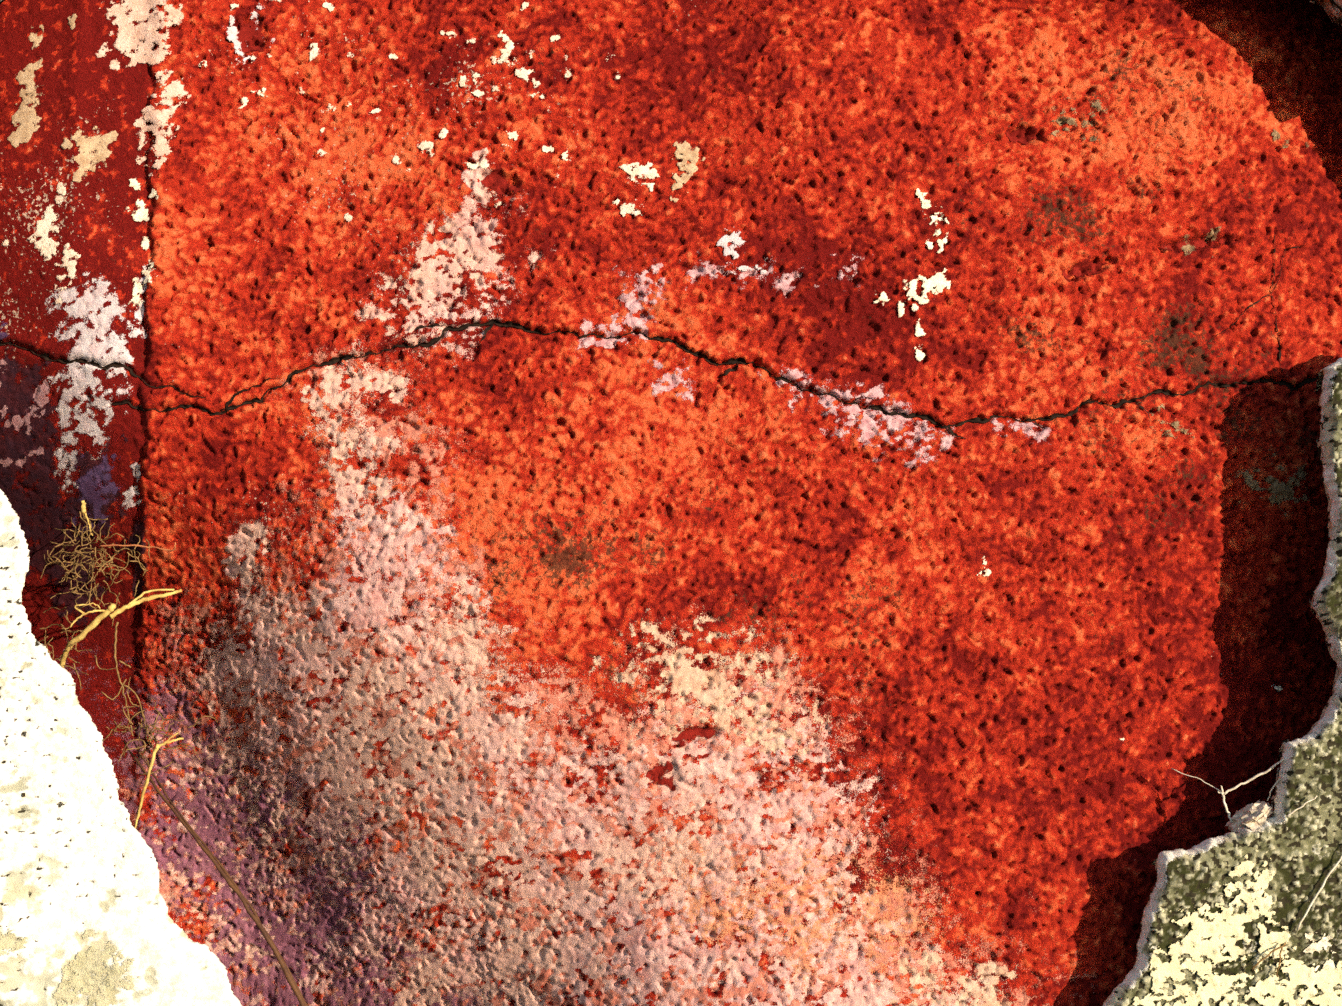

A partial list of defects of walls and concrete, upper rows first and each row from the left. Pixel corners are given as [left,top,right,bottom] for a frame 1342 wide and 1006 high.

peeling [7,24,44,148]
spalling [225,3,275,64]
peeling [459,72,500,102]
peeling [490,30,533,66]
peeling [27,126,118,304]
peeling [95,0,191,306]
peeling [613,141,705,217]
crack [0,234,1319,439]
peeling [717,228,767,276]
peeling [874,188,951,361]
peeling [1103,358,1342,1006]
spalling [646,761,676,791]